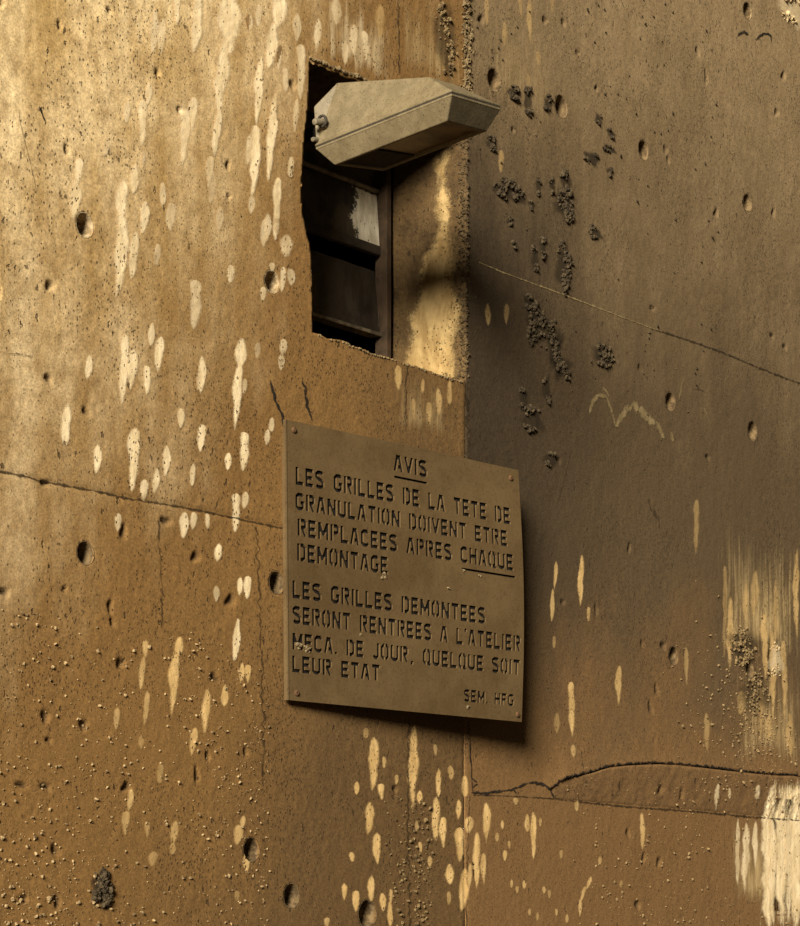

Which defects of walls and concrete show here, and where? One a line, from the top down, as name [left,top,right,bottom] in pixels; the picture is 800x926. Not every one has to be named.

spalling [493,168,575,224]
leakage [395,154,461,412]
crack [270,380,284,425]
crack [302,380,312,420]
spalling [519,293,571,433]
spalling [730,626,781,716]
leakage [726,554,799,753]
crack [469,742,799,798]
spalling [91,867,114,908]
leakage [735,782,800,926]